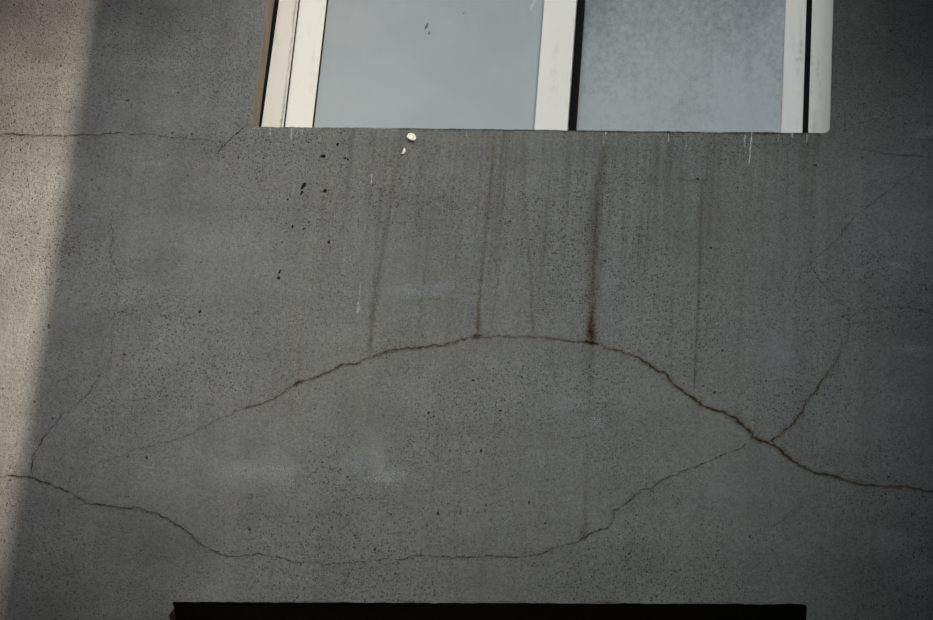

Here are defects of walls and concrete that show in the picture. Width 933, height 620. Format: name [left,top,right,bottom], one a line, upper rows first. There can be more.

crack [548,337,924,543]